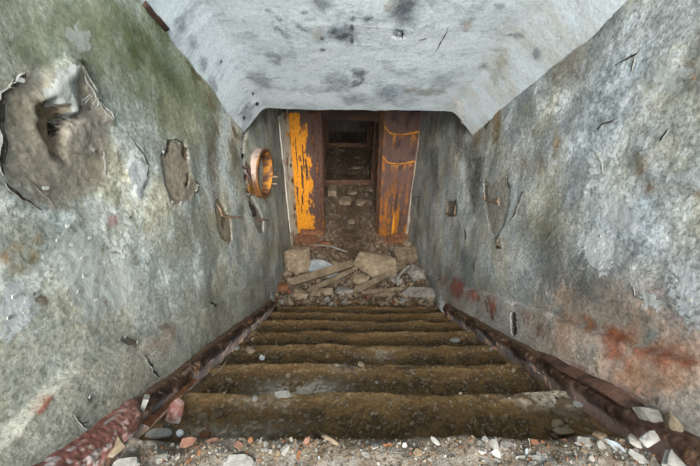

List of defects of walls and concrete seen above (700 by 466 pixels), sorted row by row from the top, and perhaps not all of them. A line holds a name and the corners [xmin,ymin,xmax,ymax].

water stain [395,0,414,23]
water stain [321,17,354,43]
crack [615,48,641,74]
spalling [34,100,108,160]
spalling [161,141,197,205]
spalling [215,198,242,244]
crack [491,184,528,234]
corrosion [606,329,630,358]
crack [143,354,160,377]